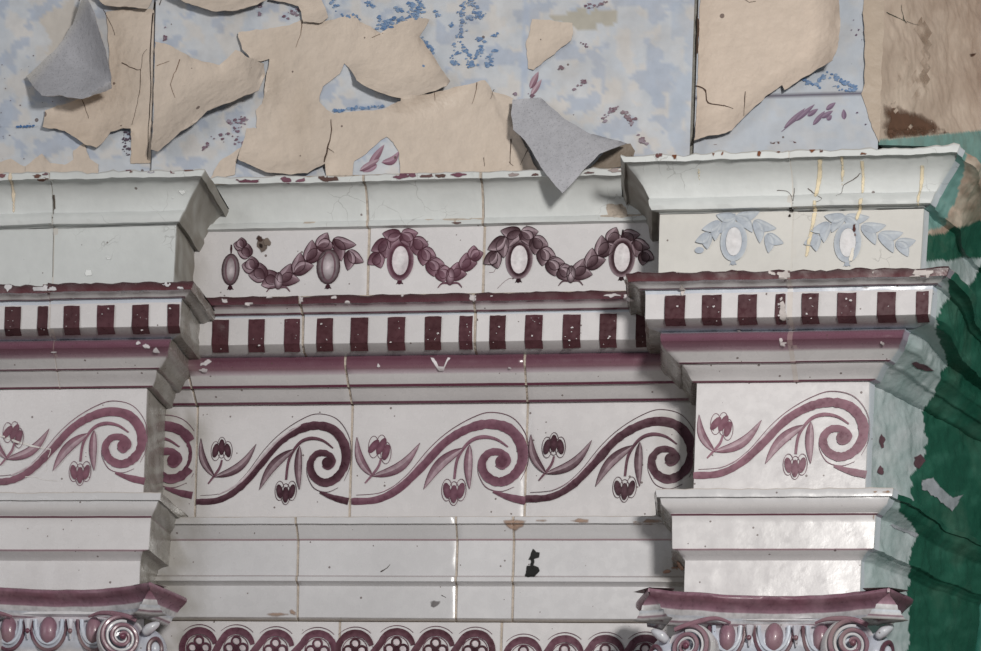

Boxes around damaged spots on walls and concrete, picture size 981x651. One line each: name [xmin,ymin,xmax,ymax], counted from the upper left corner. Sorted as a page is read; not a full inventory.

peeling [526,19,573,70]
peeling [694,0,840,141]
peeling [0,0,538,184]
spalling [768,270,790,280]
spalling [909,270,933,279]
spalling [779,297,787,321]
peeling [914,454,926,468]
peeling [922,478,962,511]
spalling [525,549,540,577]